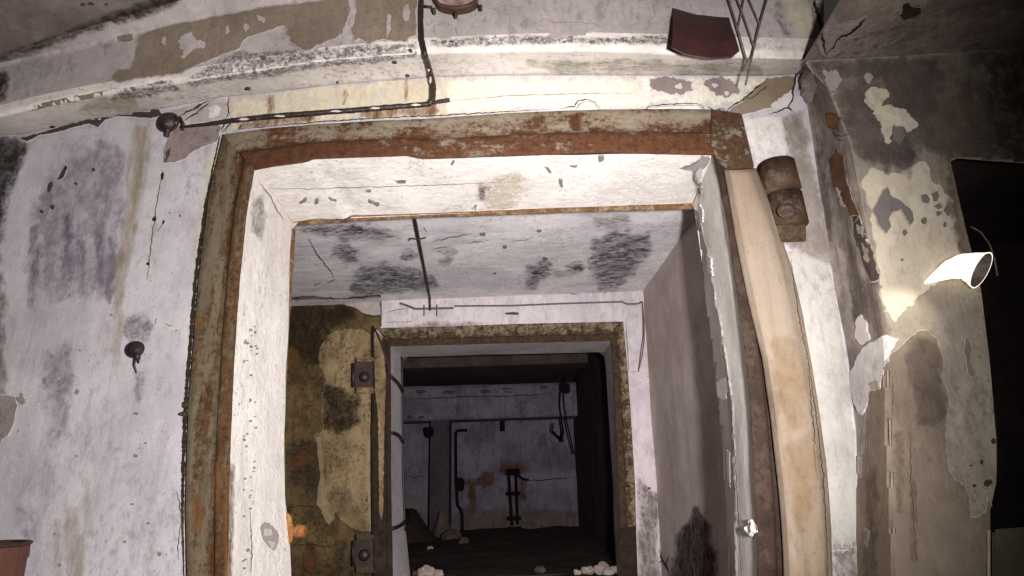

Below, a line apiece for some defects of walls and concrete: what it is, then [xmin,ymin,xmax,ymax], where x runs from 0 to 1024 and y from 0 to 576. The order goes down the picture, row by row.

crack [813,0,904,57]
peeling [19,0,418,164]
corrosion [570,114,582,131]
crack [709,69,802,114]
damp [0,136,26,223]
spalling [828,147,952,283]
damp [303,224,437,297]
damp [569,218,650,289]
damp [288,305,353,364]
peeling [854,315,871,345]
corrosion [465,463,526,513]
spalling [856,329,993,576]